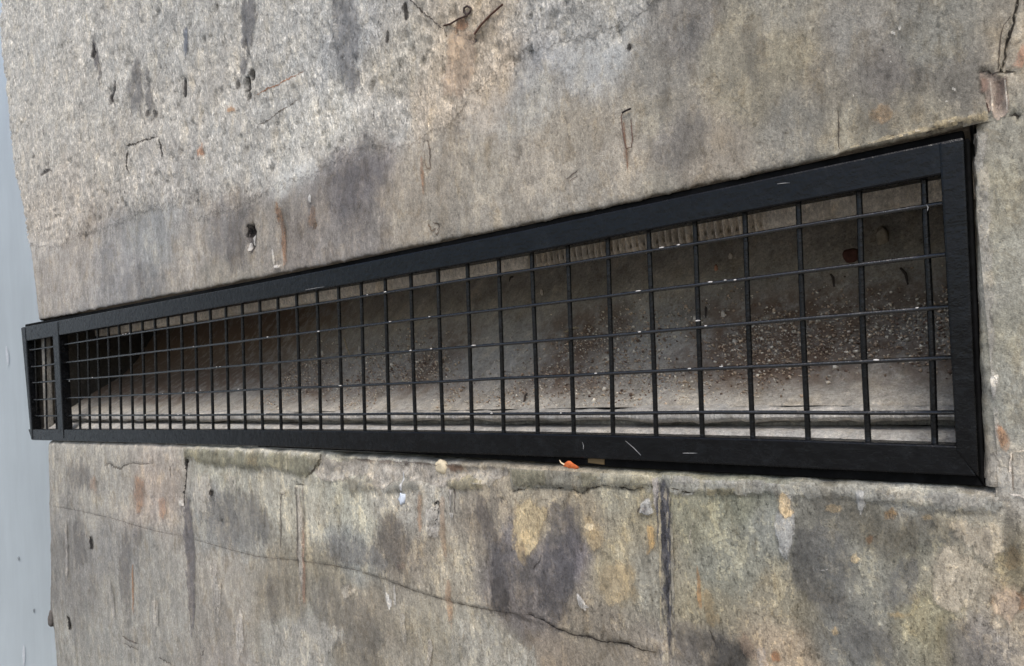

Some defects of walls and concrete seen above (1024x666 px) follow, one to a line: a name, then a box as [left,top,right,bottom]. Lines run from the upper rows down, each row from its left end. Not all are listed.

crack [979,0,1019,75]
spalling [850,73,1019,148]
rust [275,203,286,256]
crack [197,540,652,652]
leakage [476,498,601,617]
leakage [600,564,634,605]